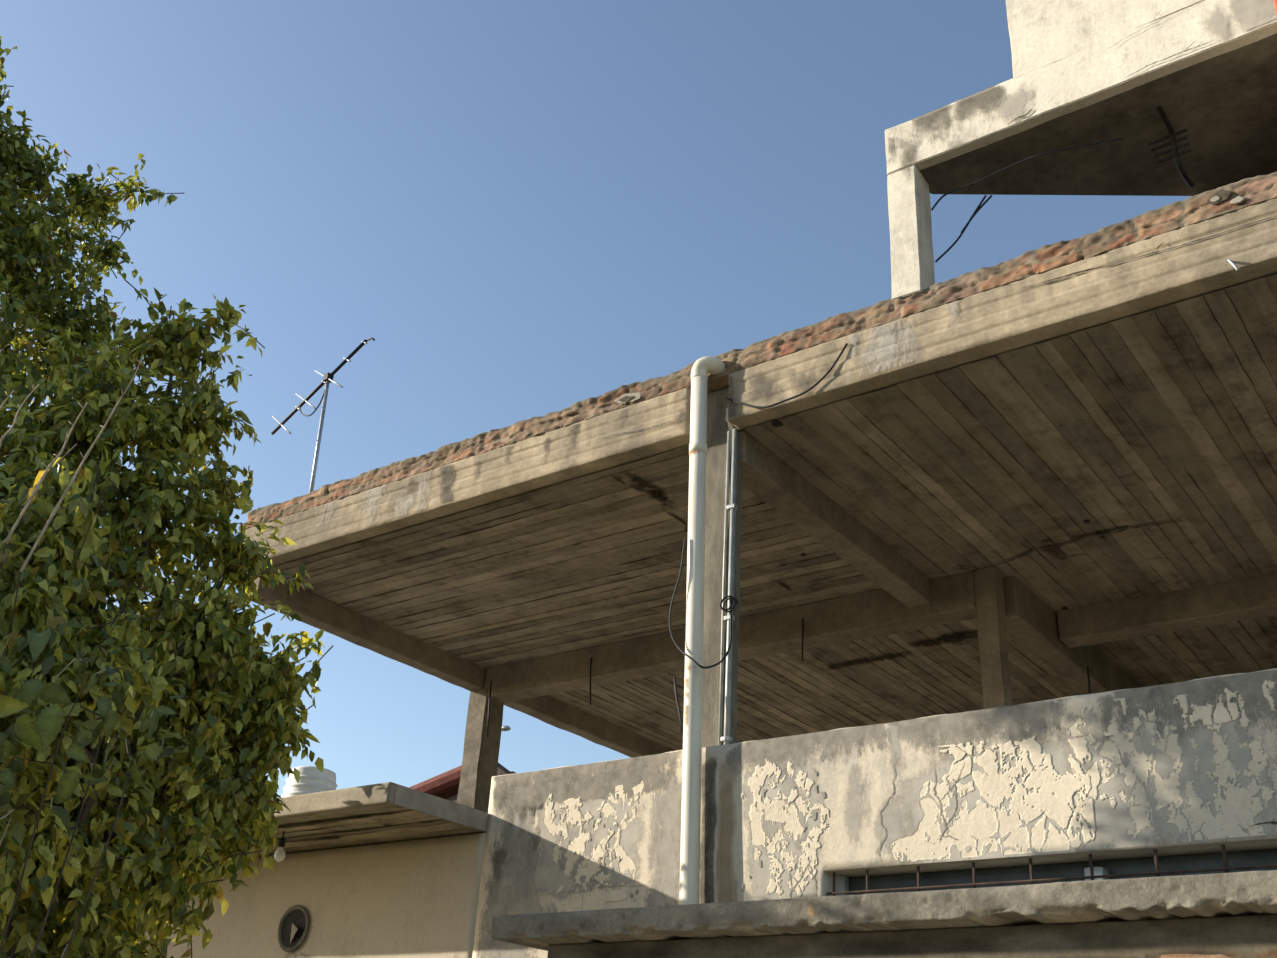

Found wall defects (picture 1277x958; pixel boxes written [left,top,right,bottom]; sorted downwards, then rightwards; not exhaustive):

leakage [478,751,682,958]
peeling [532,781,645,905]
peeling [736,750,829,900]
leakage [699,699,1077,904]
peeling [891,688,1277,863]
peeling [1262,680,1277,720]